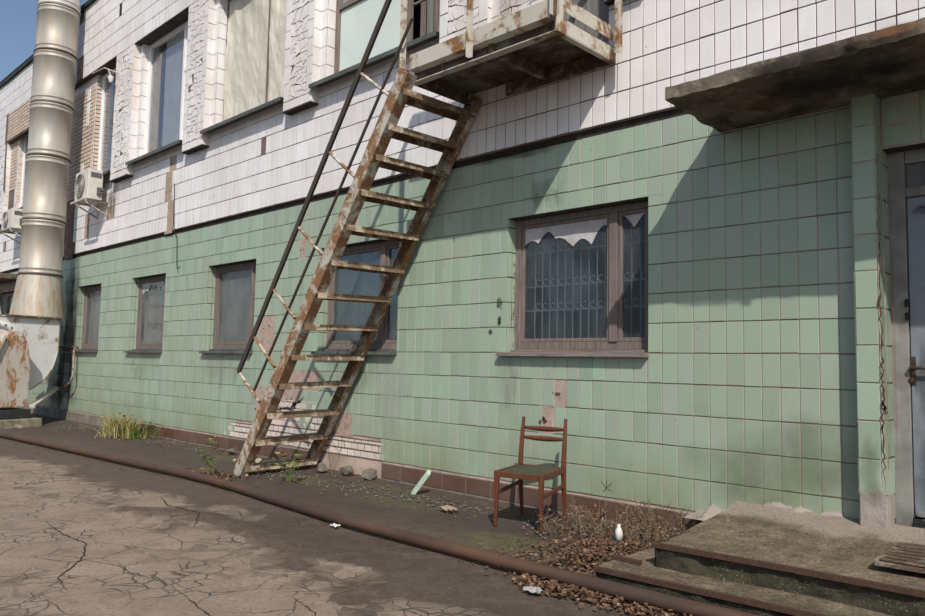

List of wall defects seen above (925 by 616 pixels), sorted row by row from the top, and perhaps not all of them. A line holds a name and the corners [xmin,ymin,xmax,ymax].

spalling [164,154,178,235]
spalling [259,316,275,351]
spalling [223,385,267,440]
spalling [265,367,324,450]
spalling [322,413,384,462]
spalling [538,380,565,435]
crack [10,523,134,589]